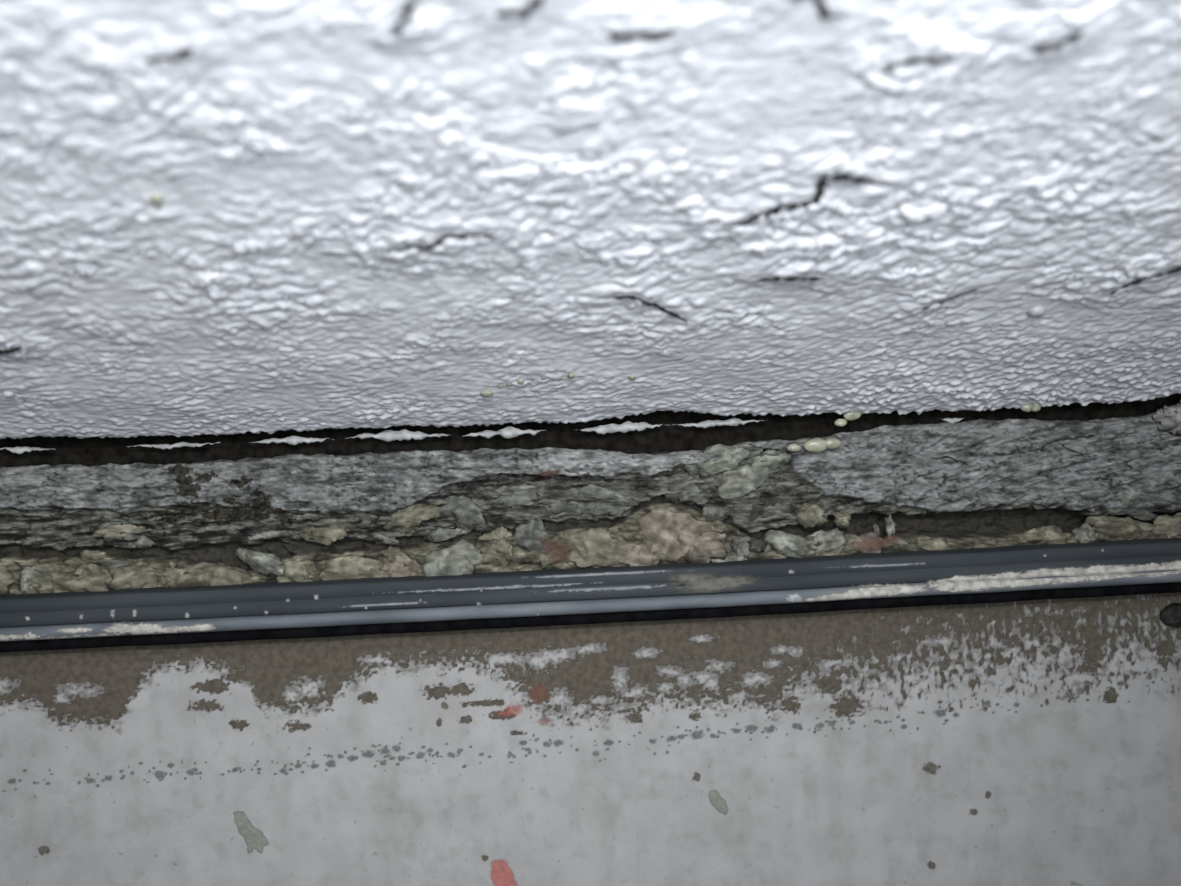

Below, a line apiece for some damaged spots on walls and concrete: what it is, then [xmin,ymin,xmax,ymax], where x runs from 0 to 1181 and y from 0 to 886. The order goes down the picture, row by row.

crack [0,393,1181,500]
peeling [1151,400,1181,436]
spalling [0,442,951,595]
spalling [1023,472,1181,545]